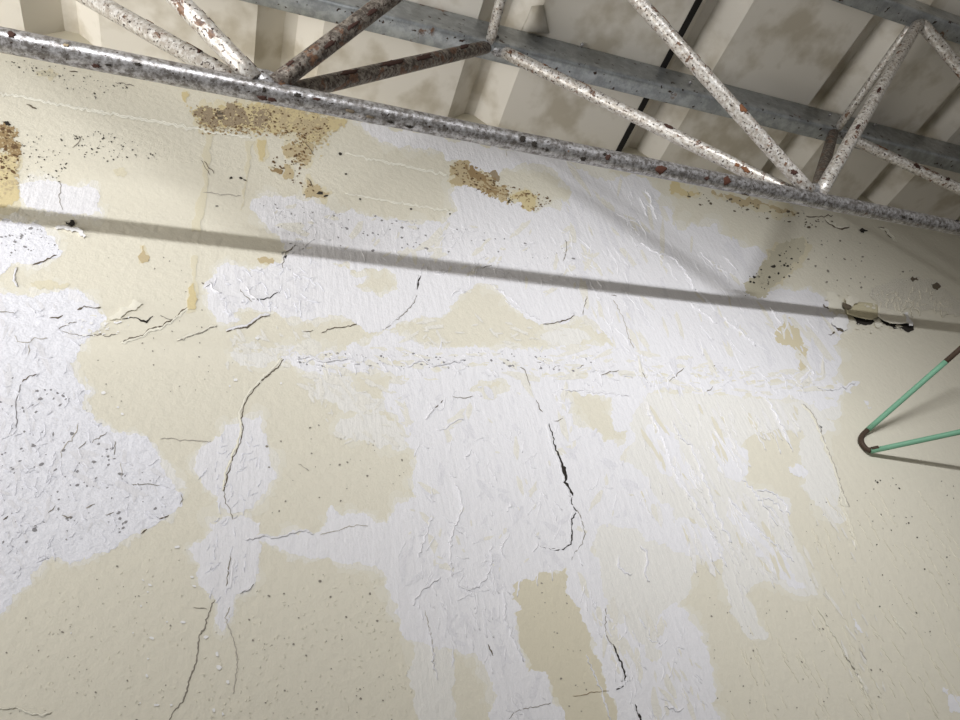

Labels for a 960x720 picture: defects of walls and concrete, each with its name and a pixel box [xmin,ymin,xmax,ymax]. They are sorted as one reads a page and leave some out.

rust [0,121,23,215]
rust [181,87,355,205]
rust [446,160,539,212]
crack [0,245,296,427]
crack [222,358,284,519]
crack [520,362,618,559]
crack [169,557,238,720]
flaking render [512,568,618,720]
crack [575,608,642,720]